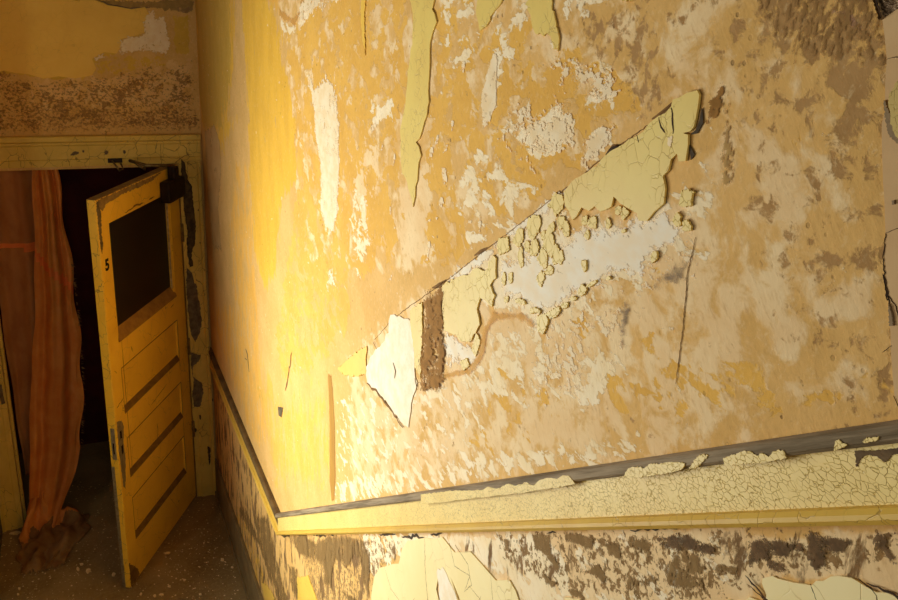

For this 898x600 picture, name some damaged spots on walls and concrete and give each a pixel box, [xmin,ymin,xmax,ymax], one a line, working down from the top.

peeling [0,0,193,79]
leakage [0,61,221,250]
peeling [432,0,704,409]
flaking render [873,0,898,402]
crack [676,237,696,381]
crack [882,228,898,315]
flaking render [338,302,424,428]
peeling [421,475,576,504]
peeling [623,454,709,478]
peeling [834,436,898,467]
peeling [371,533,519,600]
peeling [746,575,898,600]